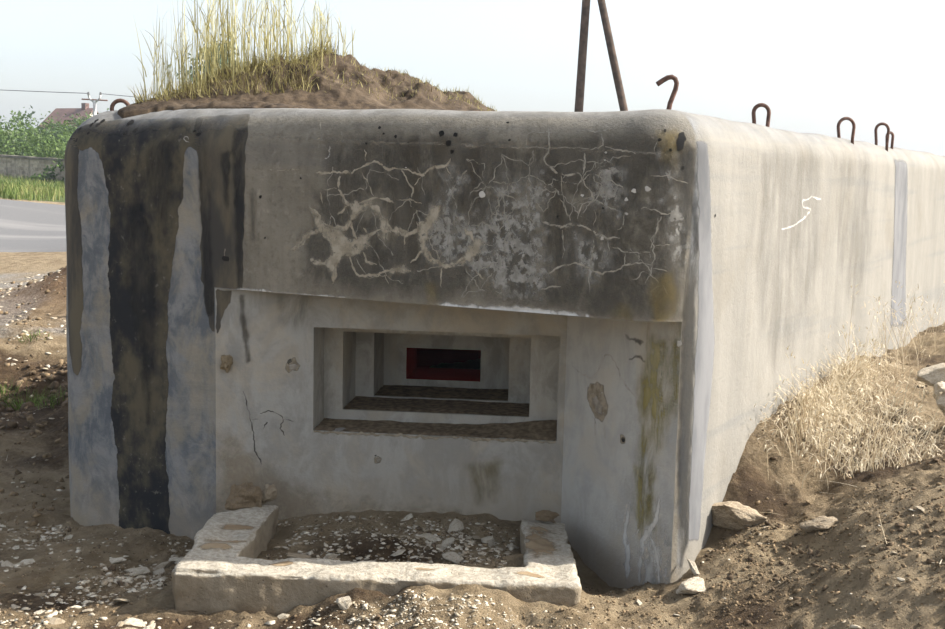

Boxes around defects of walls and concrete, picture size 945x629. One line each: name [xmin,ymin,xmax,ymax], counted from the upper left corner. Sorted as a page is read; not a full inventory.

crack [270,125,675,297]
damp [64,117,271,534]
crack [243,392,293,464]
damp [308,137,698,584]
spalling [587,382,608,438]